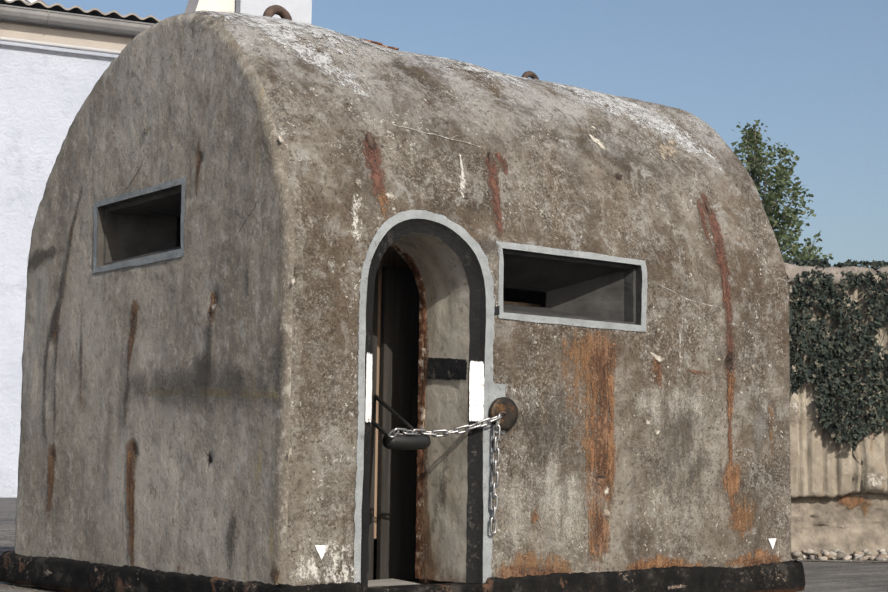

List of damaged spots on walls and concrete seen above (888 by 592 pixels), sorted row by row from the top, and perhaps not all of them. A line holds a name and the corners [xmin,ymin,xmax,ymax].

rust [363,132,389,216]
rust [486,152,509,236]
rust [123,299,139,420]
rust [205,292,217,400]
rust [697,194,756,537]
rust [46,445,56,516]
rust [126,438,137,566]
rust [562,330,619,570]
rust [496,551,569,579]
rust [626,554,701,571]
rust [725,549,781,567]